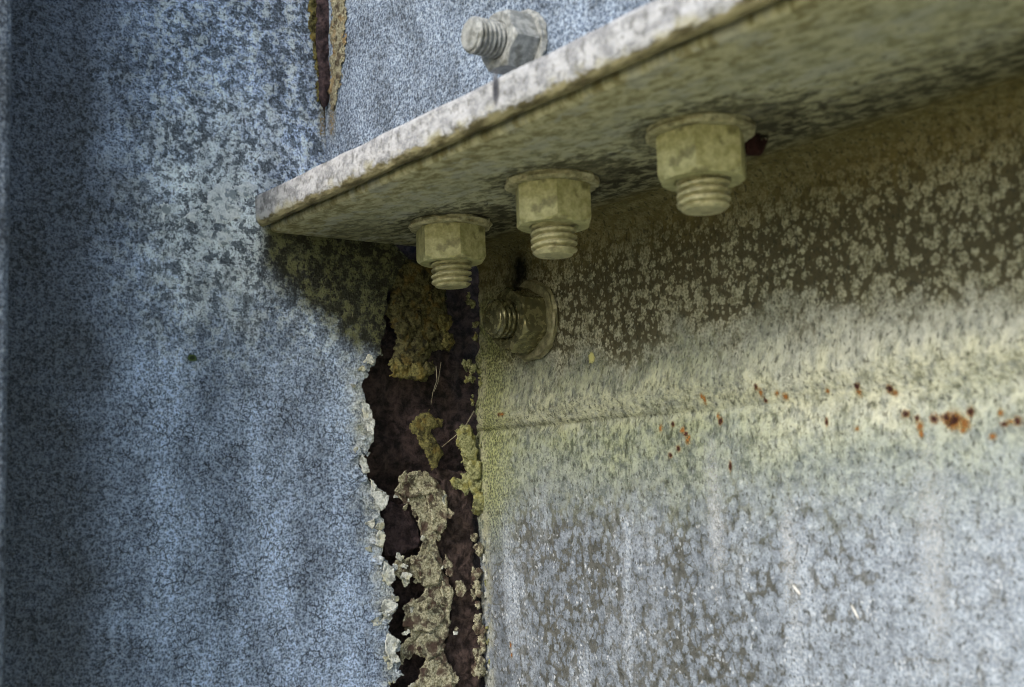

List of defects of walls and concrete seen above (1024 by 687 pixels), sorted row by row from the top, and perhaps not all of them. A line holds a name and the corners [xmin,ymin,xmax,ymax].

crack [308,0,347,112]
rust [902,408,974,437]
rust [990,410,1021,439]
peeling [450,477,469,496]